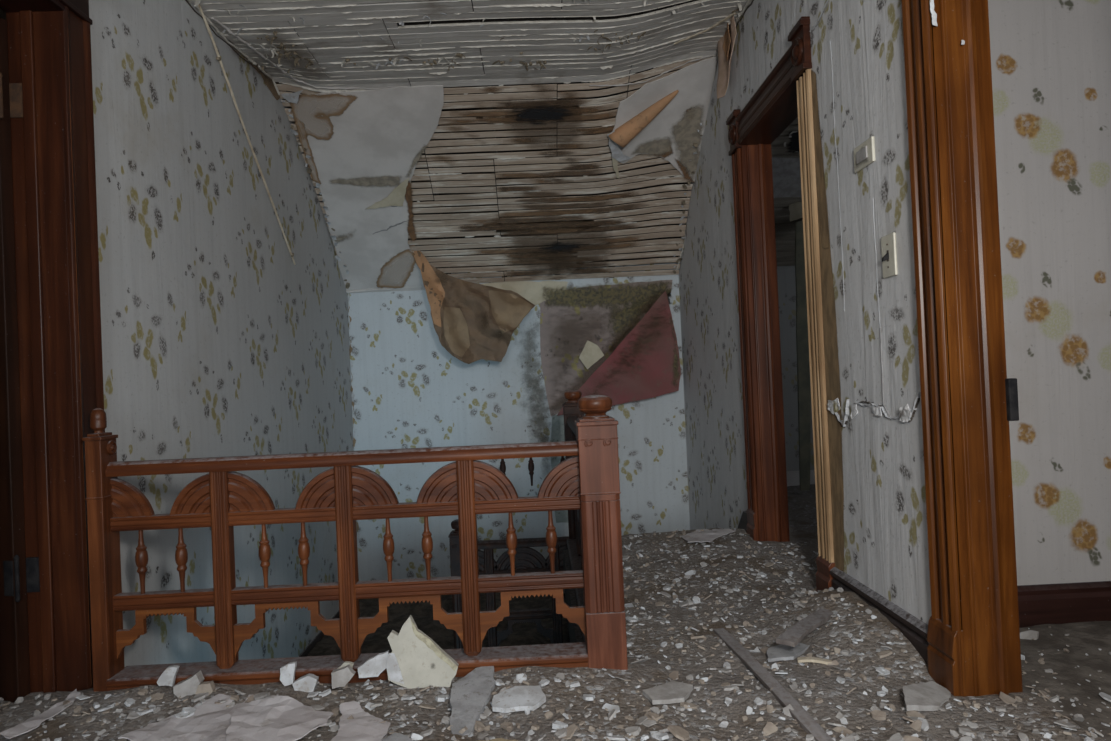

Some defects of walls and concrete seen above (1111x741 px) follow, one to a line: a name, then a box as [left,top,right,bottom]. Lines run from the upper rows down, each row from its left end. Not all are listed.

flaking render [245,31,314,100]
leakage [633,107,702,183]
leakage [449,85,670,340]